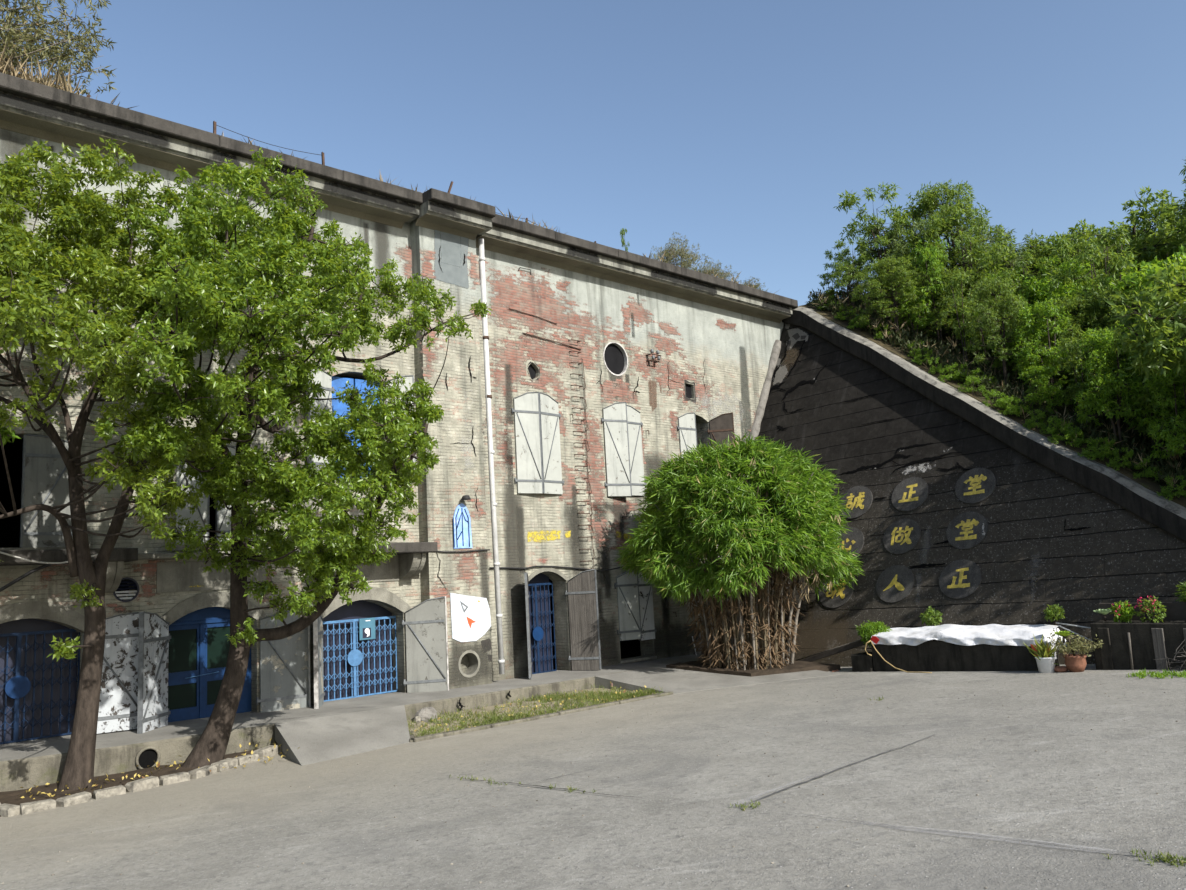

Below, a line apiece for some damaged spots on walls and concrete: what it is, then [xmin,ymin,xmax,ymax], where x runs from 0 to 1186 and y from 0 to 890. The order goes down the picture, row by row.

peeling [716,319,736,331]
peeling [394,231,719,564]
crack [768,341,827,432]
crack [842,443,982,500]